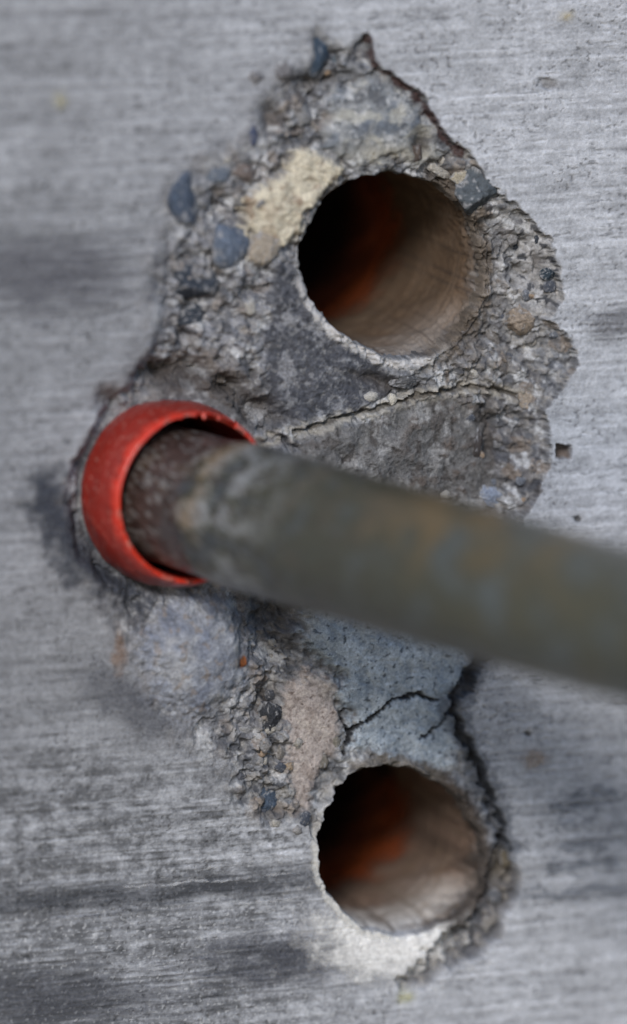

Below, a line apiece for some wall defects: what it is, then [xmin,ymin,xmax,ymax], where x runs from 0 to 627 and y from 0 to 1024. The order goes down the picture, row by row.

crack [292,383,517,435]
spalling [55,23,578,994]
crack [339,660,514,853]